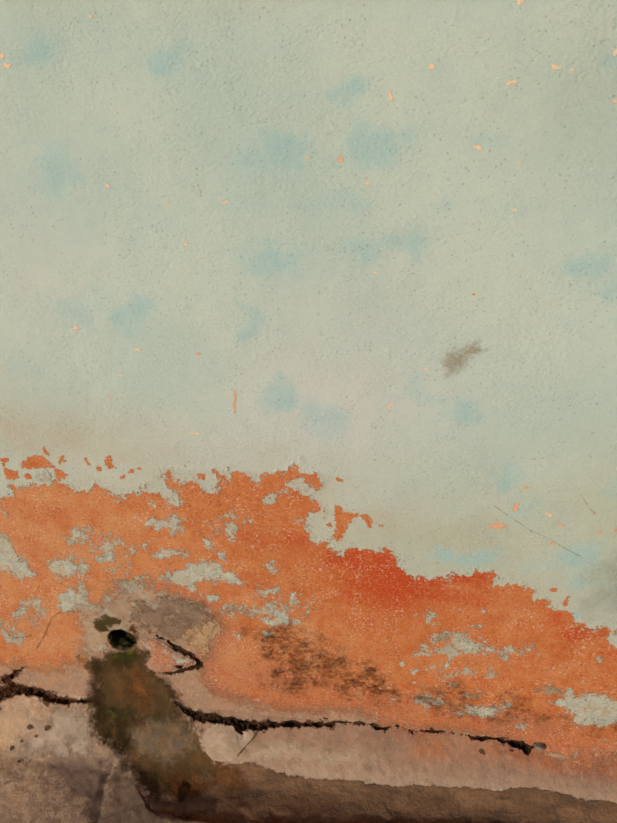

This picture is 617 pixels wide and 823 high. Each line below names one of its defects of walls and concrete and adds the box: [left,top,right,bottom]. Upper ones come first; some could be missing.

crack [15,611,79,649]
crack [149,632,204,675]
peeling [0,446,617,776]
leakage [262,625,384,693]
crack [0,667,92,710]
crack [172,700,534,757]
leakage [16,704,617,823]
crack [135,784,187,819]